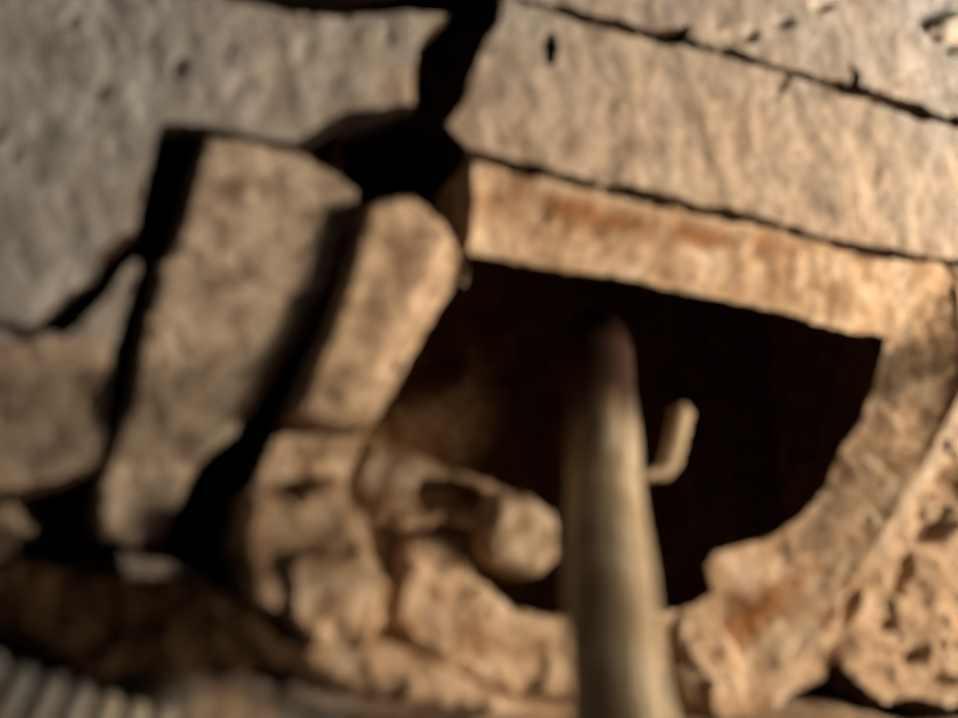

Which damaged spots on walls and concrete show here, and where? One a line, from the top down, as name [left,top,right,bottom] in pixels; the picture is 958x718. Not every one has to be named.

crack [515,0,958,129]
spalling [96,102,958,718]